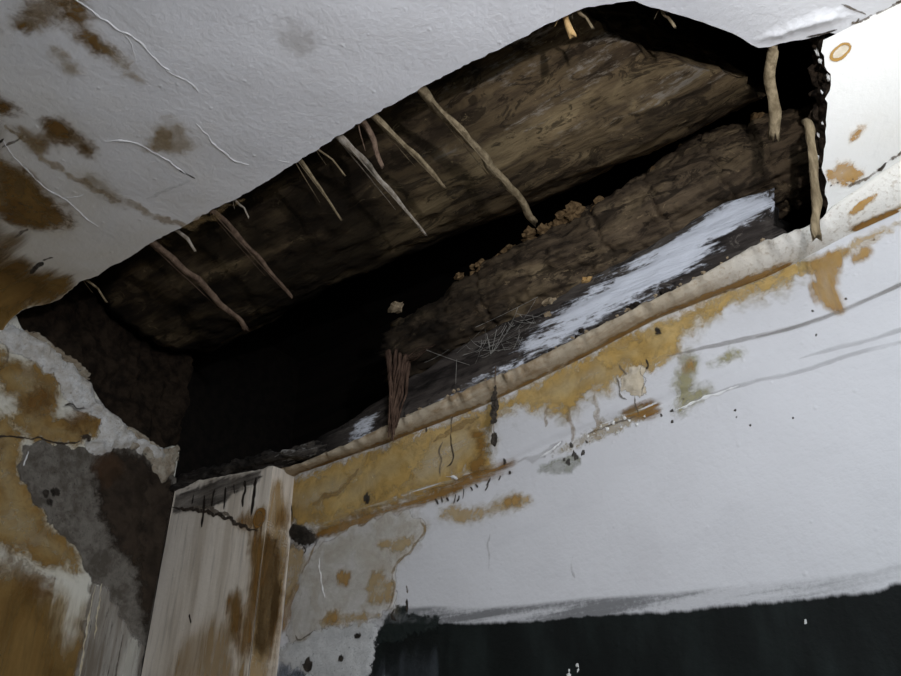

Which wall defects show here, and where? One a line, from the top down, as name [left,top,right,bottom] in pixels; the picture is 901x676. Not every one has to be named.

damp [0,161,73,330]
crack [0,134,97,226]
crack [76,0,199,92]
crack [106,139,194,178]
spalling [801,34,831,210]
damp [827,163,863,186]
crack [0,435,80,445]
damp [0,349,101,574]
spalling [0,324,180,676]
damp [249,194,901,676]
peeling [617,359,649,415]
peeling [277,504,426,676]